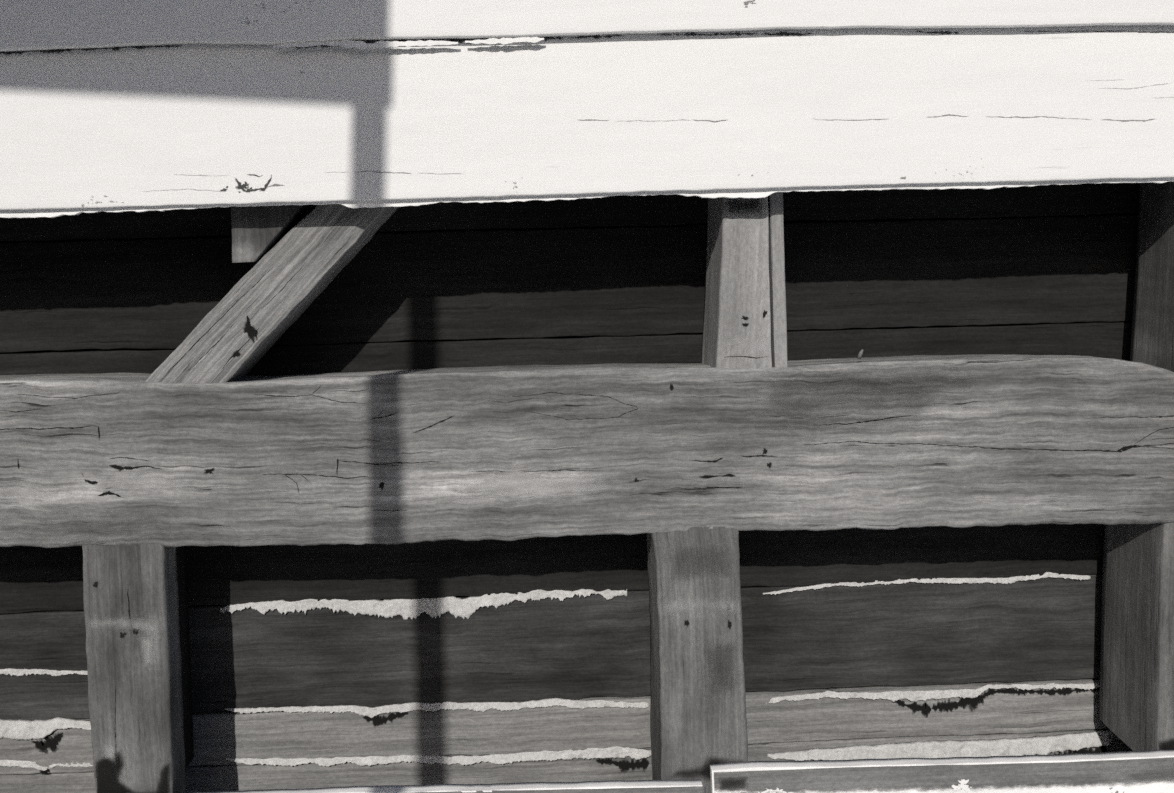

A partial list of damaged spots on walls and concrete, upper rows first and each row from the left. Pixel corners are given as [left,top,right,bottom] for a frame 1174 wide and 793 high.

peeling [273,37,544,50]
crack [934,79,1169,122]
peeling [220,174,285,193]
spalling [894,687,1100,717]
spalling [363,712,408,726]
spalling [32,733,63,753]
spalling [1054,746,1108,755]
spalling [596,758,649,772]